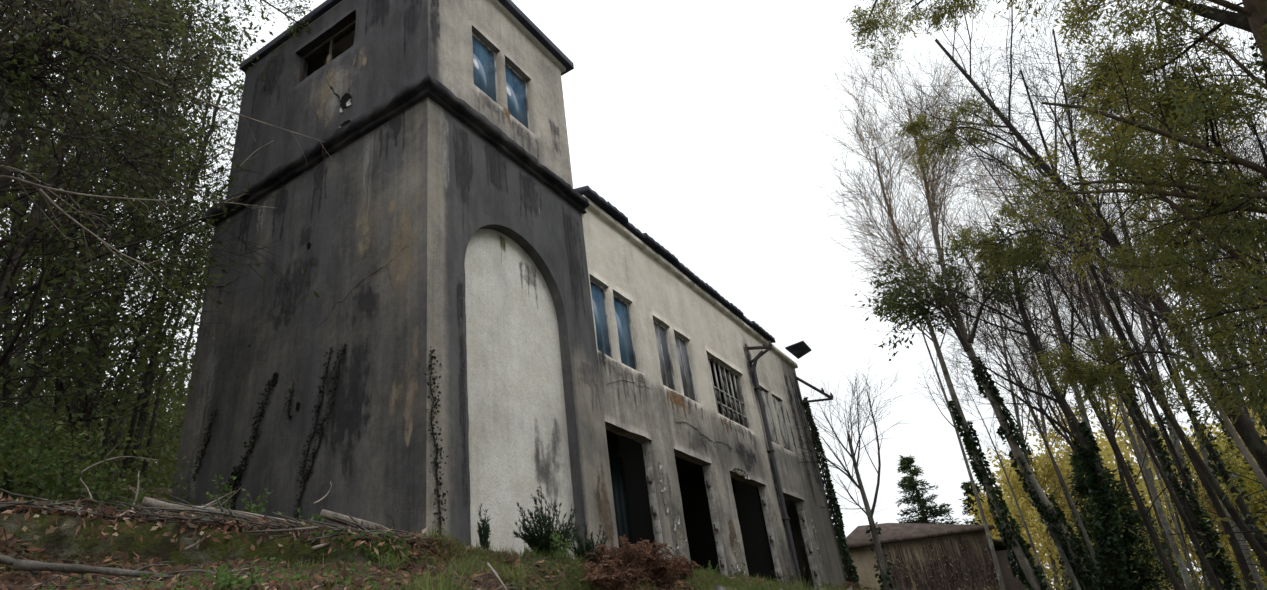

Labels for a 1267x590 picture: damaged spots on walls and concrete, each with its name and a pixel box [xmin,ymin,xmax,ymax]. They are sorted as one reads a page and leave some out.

damp [404,0,440,54]
damp [536,420,559,502]